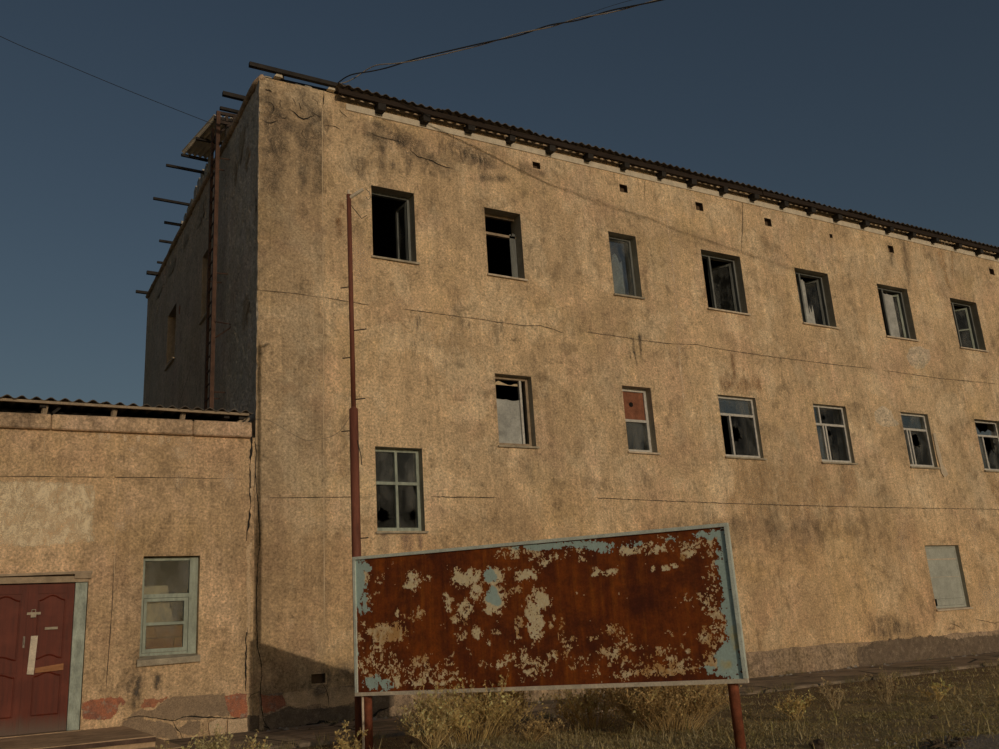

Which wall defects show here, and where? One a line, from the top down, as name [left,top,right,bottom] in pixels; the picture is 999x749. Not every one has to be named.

crack [116,89,367,737]
crack [2,472,80,480]
crack [599,498,959,509]
spalling [82,686,355,740]
crack [299,682,388,726]
spalling [372,695,395,717]